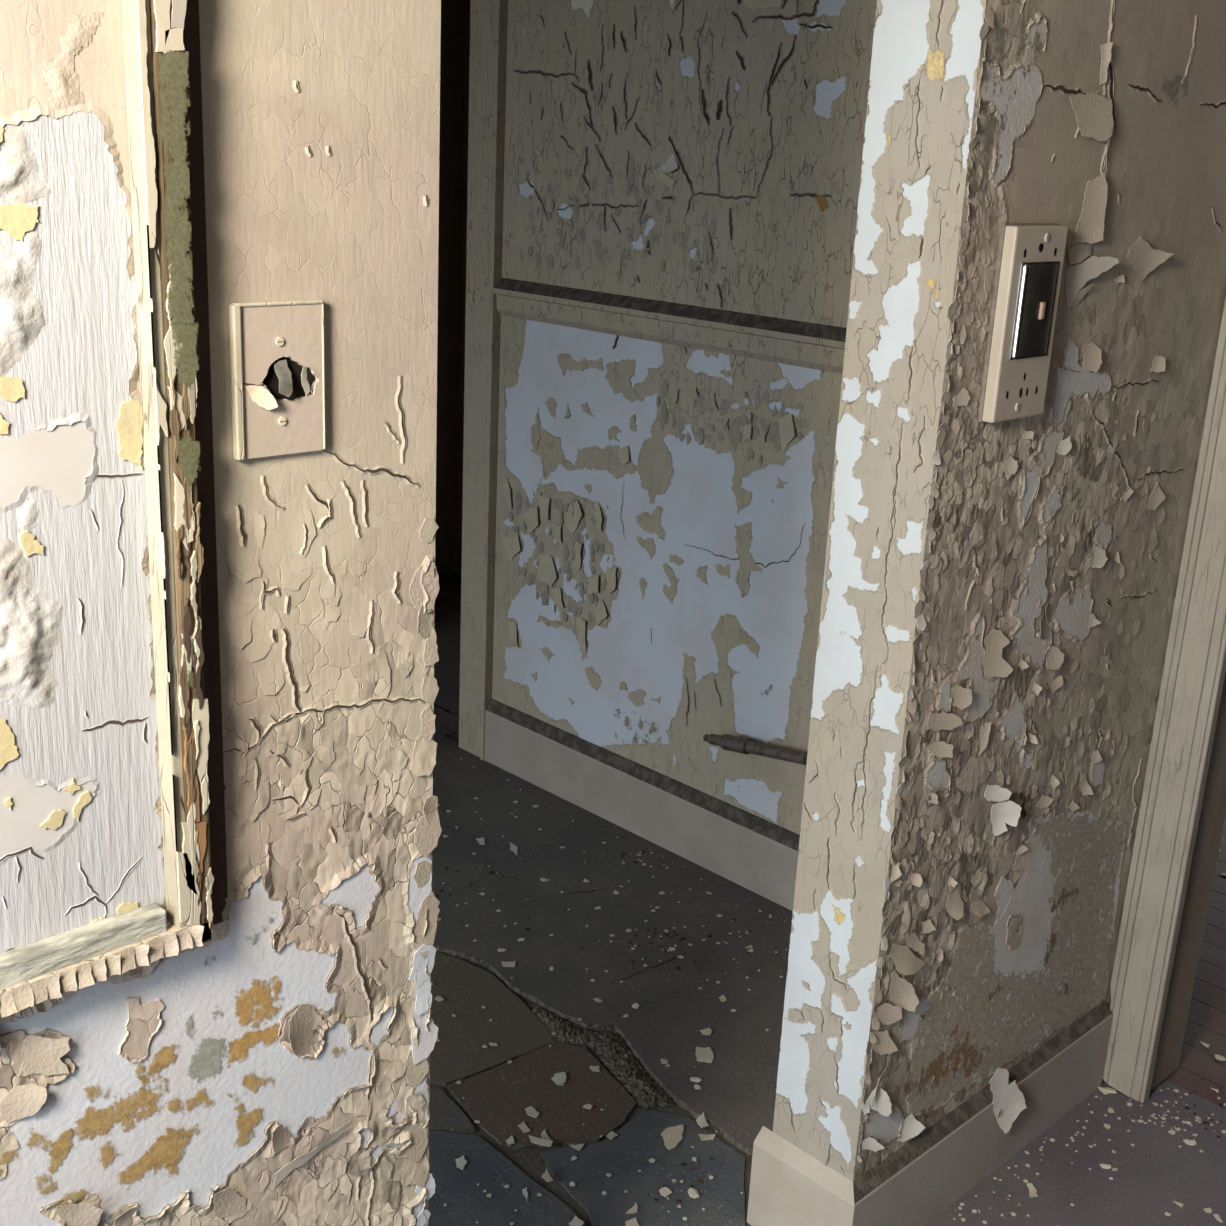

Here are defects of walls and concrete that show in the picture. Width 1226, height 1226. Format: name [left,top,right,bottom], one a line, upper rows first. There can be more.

crack [514,0,833,309]
crack [914,79,946,175]
crack [935,0,946,49]
crack [1042,0,1226,205]
peeling [0,102,166,953]
crack [235,376,420,585]
peeling [502,0,1174,1168]
crack [223,571,427,870]
crack [685,676,723,727]
peeling [0,506,442,1226]
crack [330,904,387,1121]
crack [355,1152,376,1226]